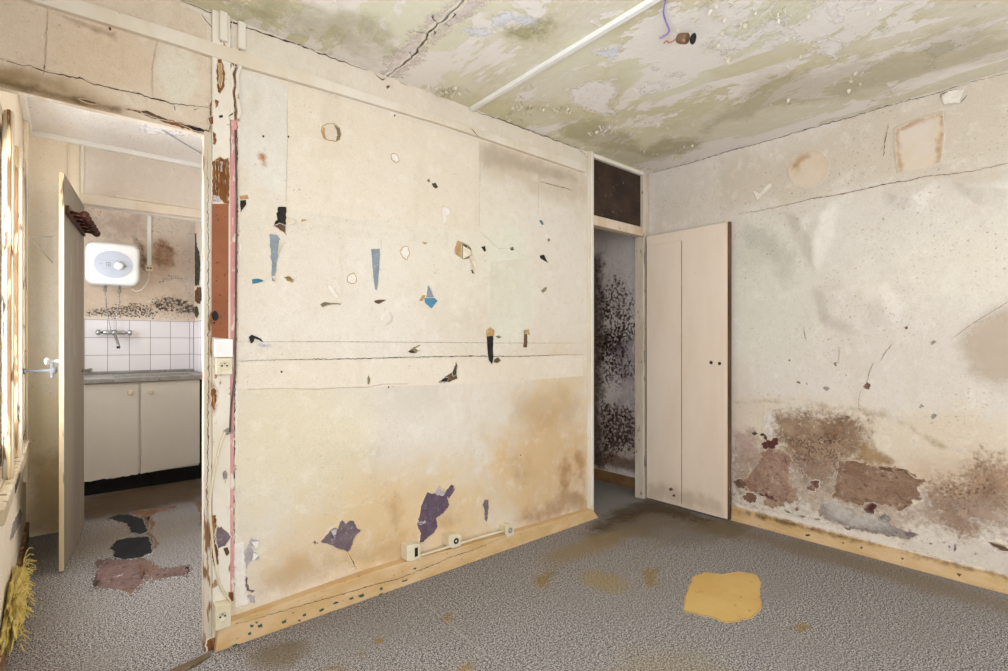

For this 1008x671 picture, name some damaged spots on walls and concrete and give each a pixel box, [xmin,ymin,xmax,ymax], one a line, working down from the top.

crack [0,56,212,111]
peeling [208,59,238,204]
crack [180,0,469,85]
leakage [86,296,195,319]
leakage [594,257,635,471]
peeling [312,518,362,553]
peeling [415,483,455,544]
leakage [733,410,890,537]
flaking render [733,431,926,541]
leakage [906,460,1008,574]